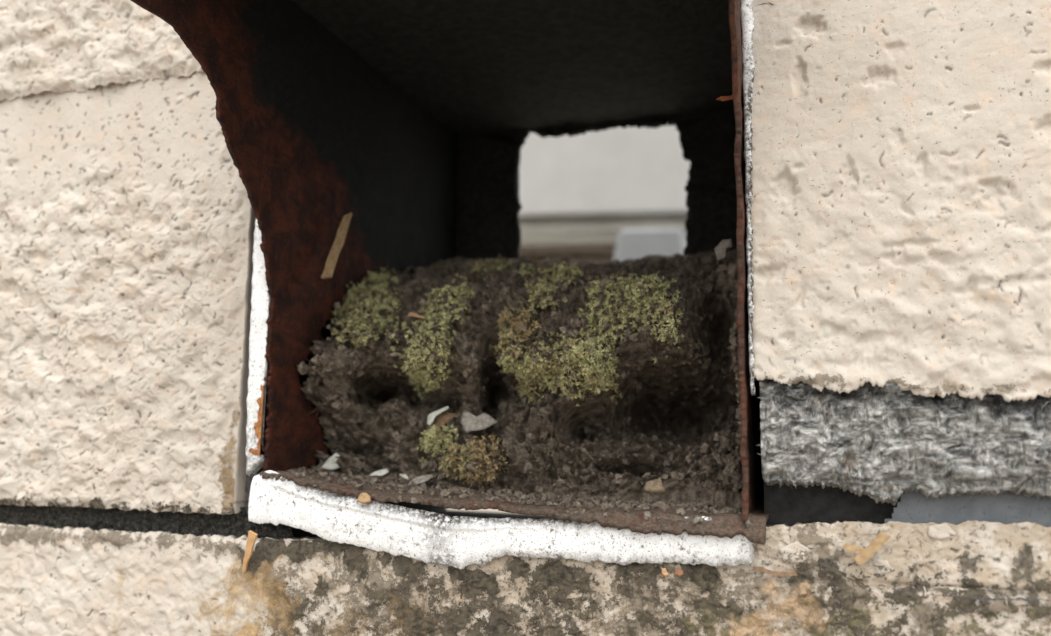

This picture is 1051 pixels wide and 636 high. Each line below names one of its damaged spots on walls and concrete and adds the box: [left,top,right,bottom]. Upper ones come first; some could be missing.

rust [249,377,266,456]
leakage [763,372,847,390]
spalling [758,377,1051,506]
leakage [888,378,1028,395]
leakage [0,411,1051,636]